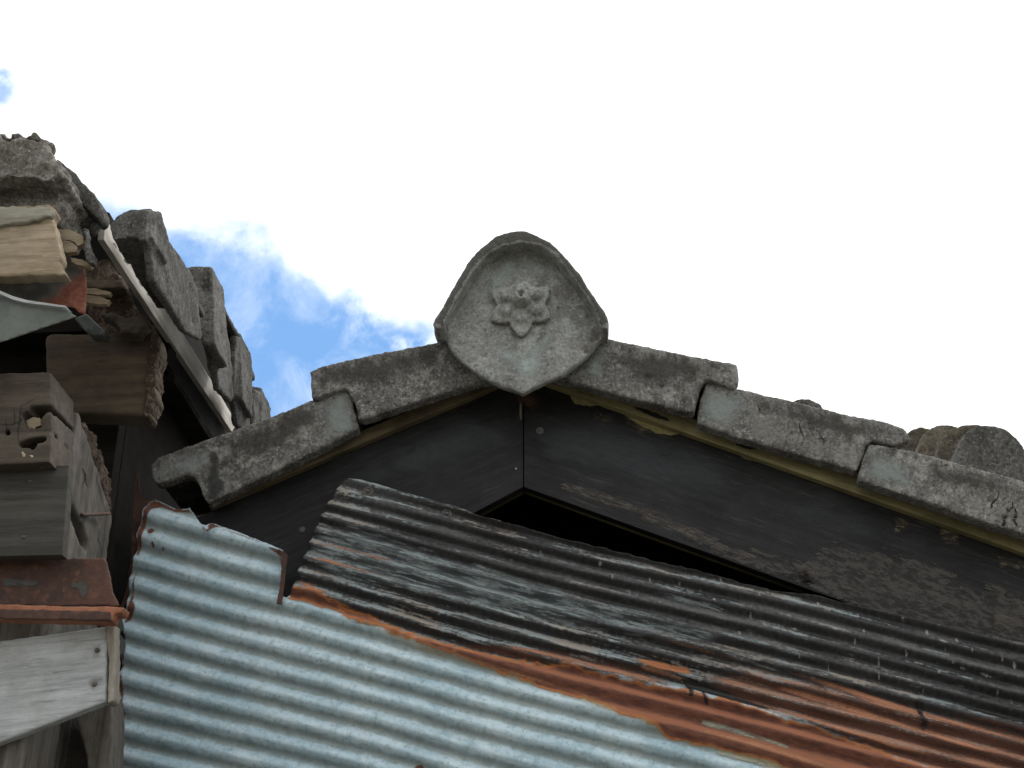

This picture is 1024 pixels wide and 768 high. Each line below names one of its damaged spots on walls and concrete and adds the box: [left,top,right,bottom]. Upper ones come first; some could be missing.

peeling [625,415,678,435]
corrosion [137,500,190,555]
crack [990,493,1018,526]
corrosion [125,571,137,622]
corrosion [288,583,1024,768]